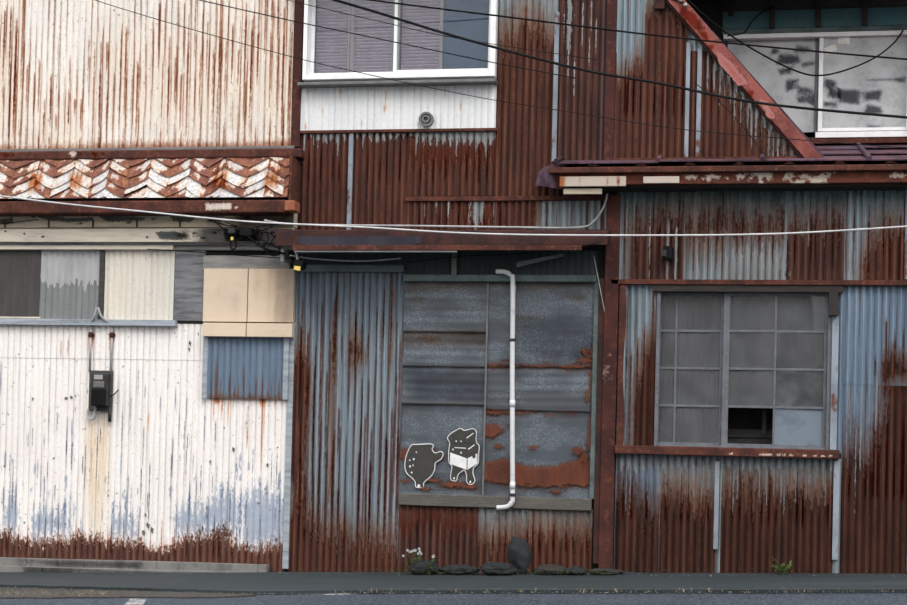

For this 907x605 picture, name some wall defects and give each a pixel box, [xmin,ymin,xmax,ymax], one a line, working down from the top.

corrosion [299,0,602,230]
corrosion [614,6,786,158]
corrosion [631,203,845,280]
corrosion [863,228,905,280]
corrosion [0,346,593,573]
corrosion [614,322,907,573]